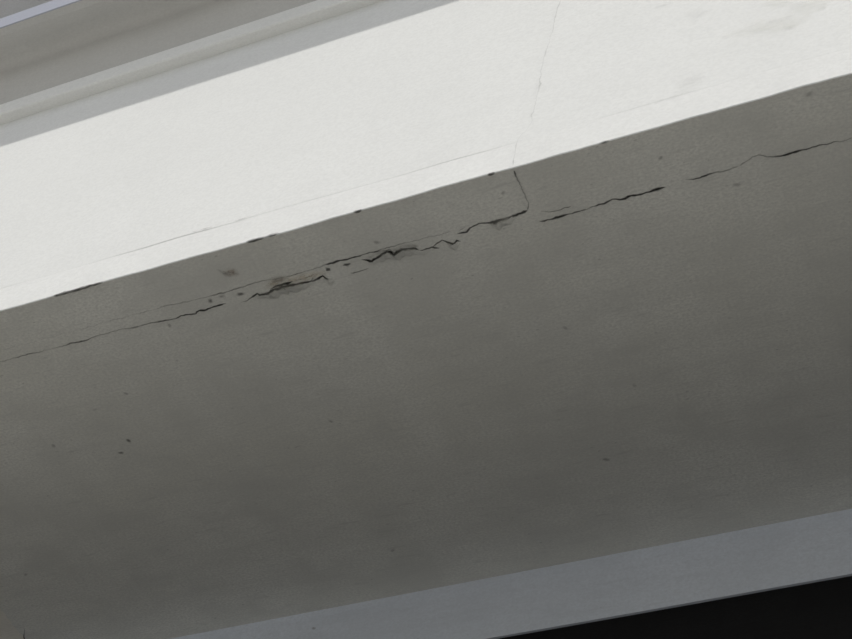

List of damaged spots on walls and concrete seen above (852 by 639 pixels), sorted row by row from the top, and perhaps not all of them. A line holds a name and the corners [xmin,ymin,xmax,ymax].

crack [774,142,833,157]
crack [458,187,665,234]
crack [326,250,379,265]
crack [148,288,238,324]